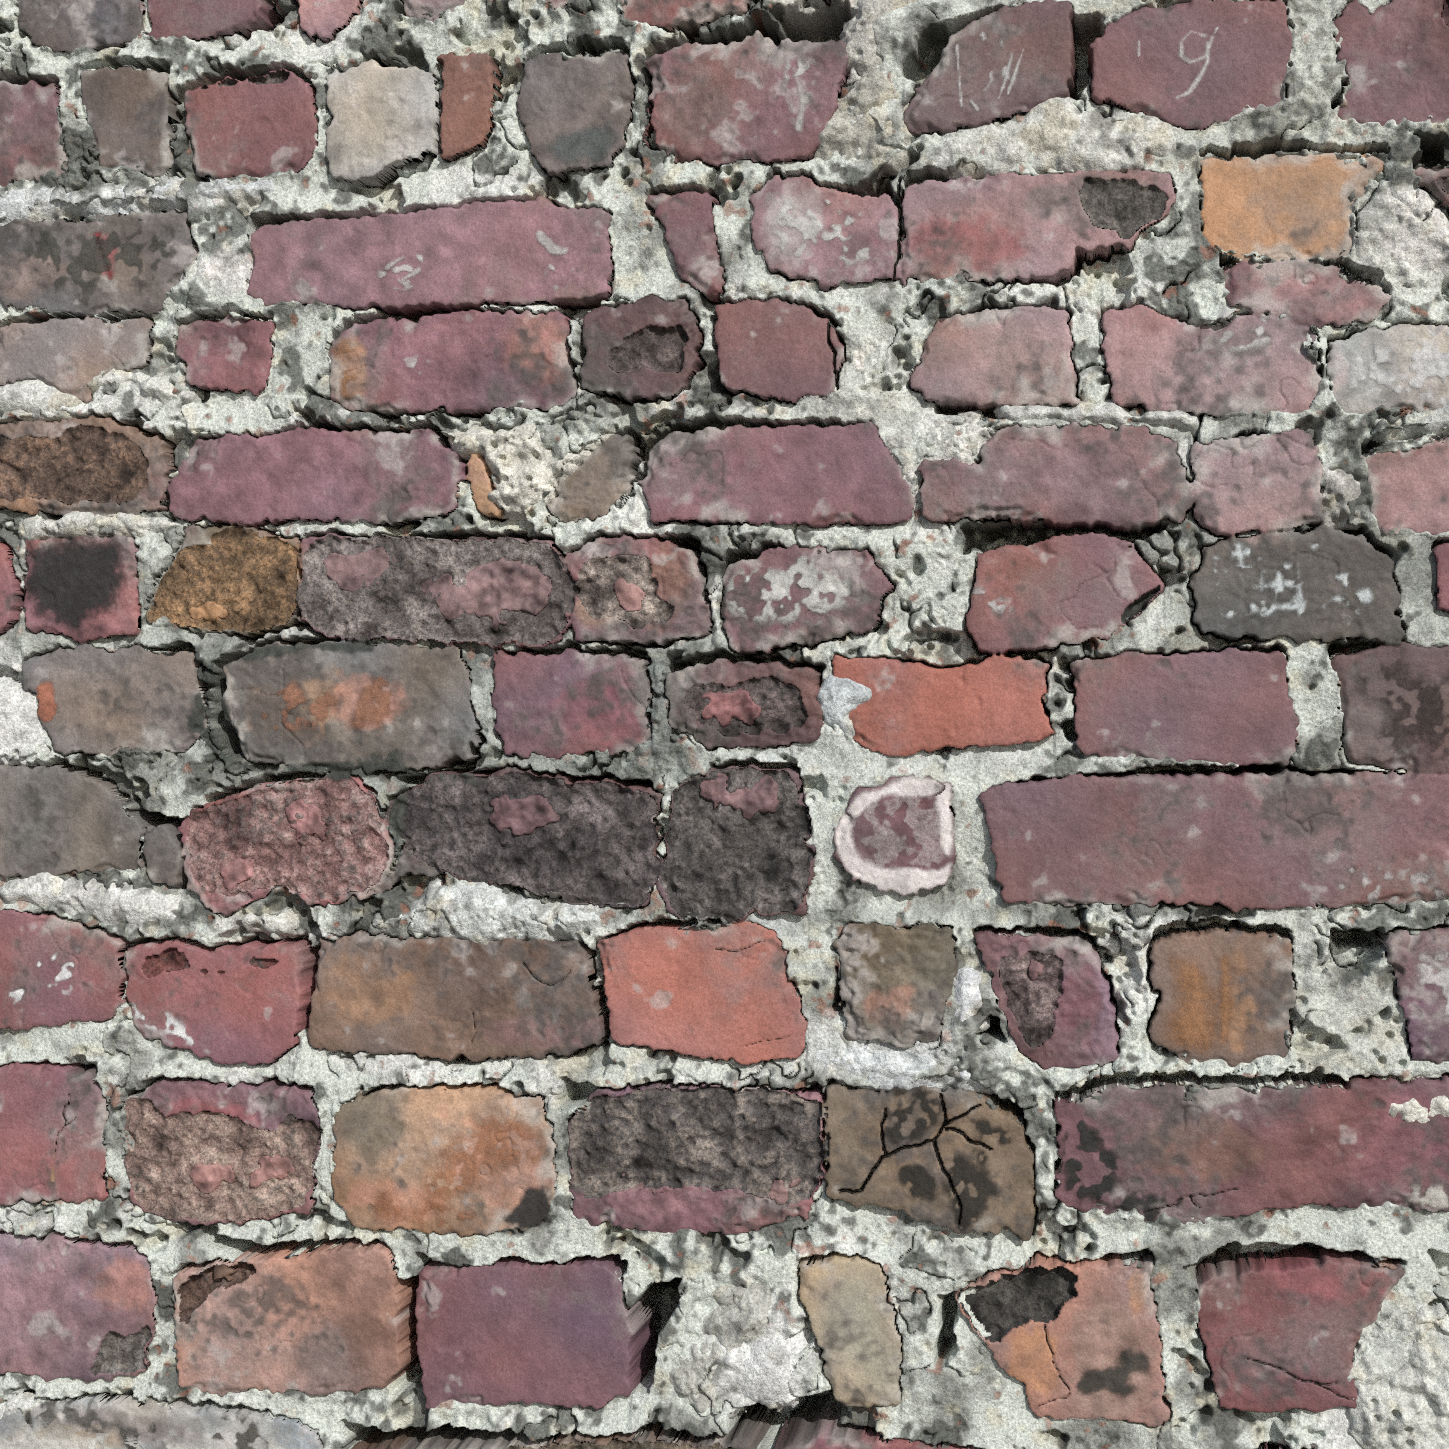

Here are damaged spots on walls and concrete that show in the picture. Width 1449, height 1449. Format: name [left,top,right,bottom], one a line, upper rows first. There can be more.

spalling [1078,177,1169,239]
crack [55,1094,70,1152]
crack [840,1094,991,1224]
spalling [957,1266,1078,1342]